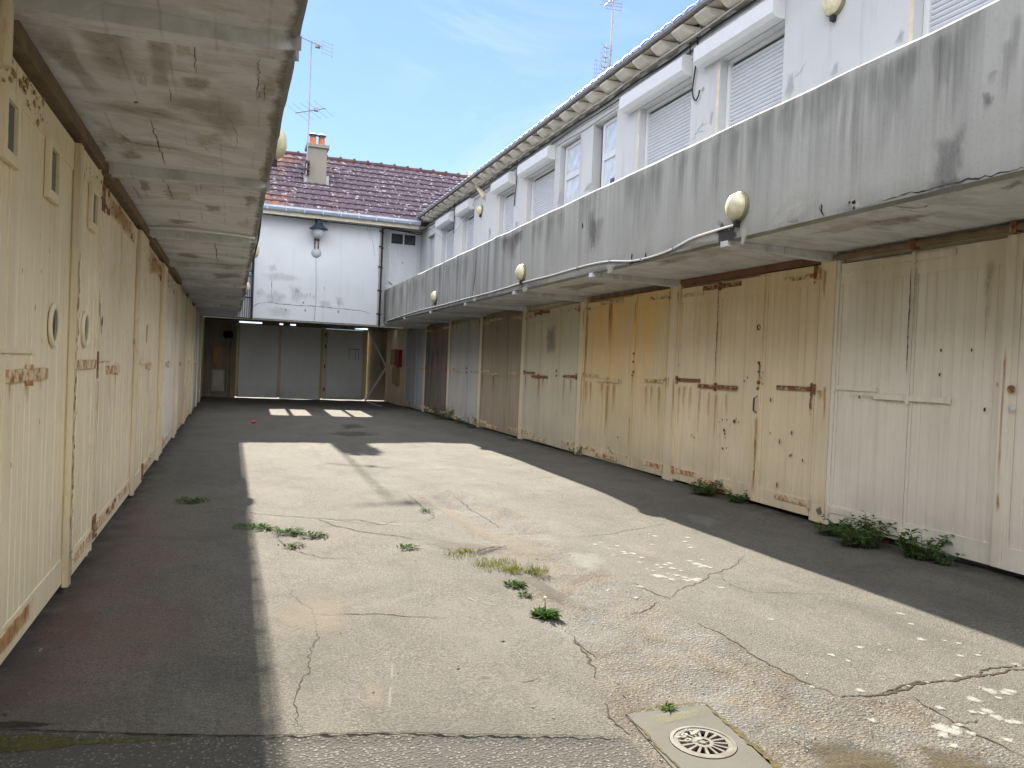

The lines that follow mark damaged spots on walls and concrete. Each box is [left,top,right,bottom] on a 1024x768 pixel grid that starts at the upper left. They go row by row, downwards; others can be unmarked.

crack [134,120,202,208]
crack [217,493,449,558]
crack [289,590,437,732]
crack [698,623,1023,756]